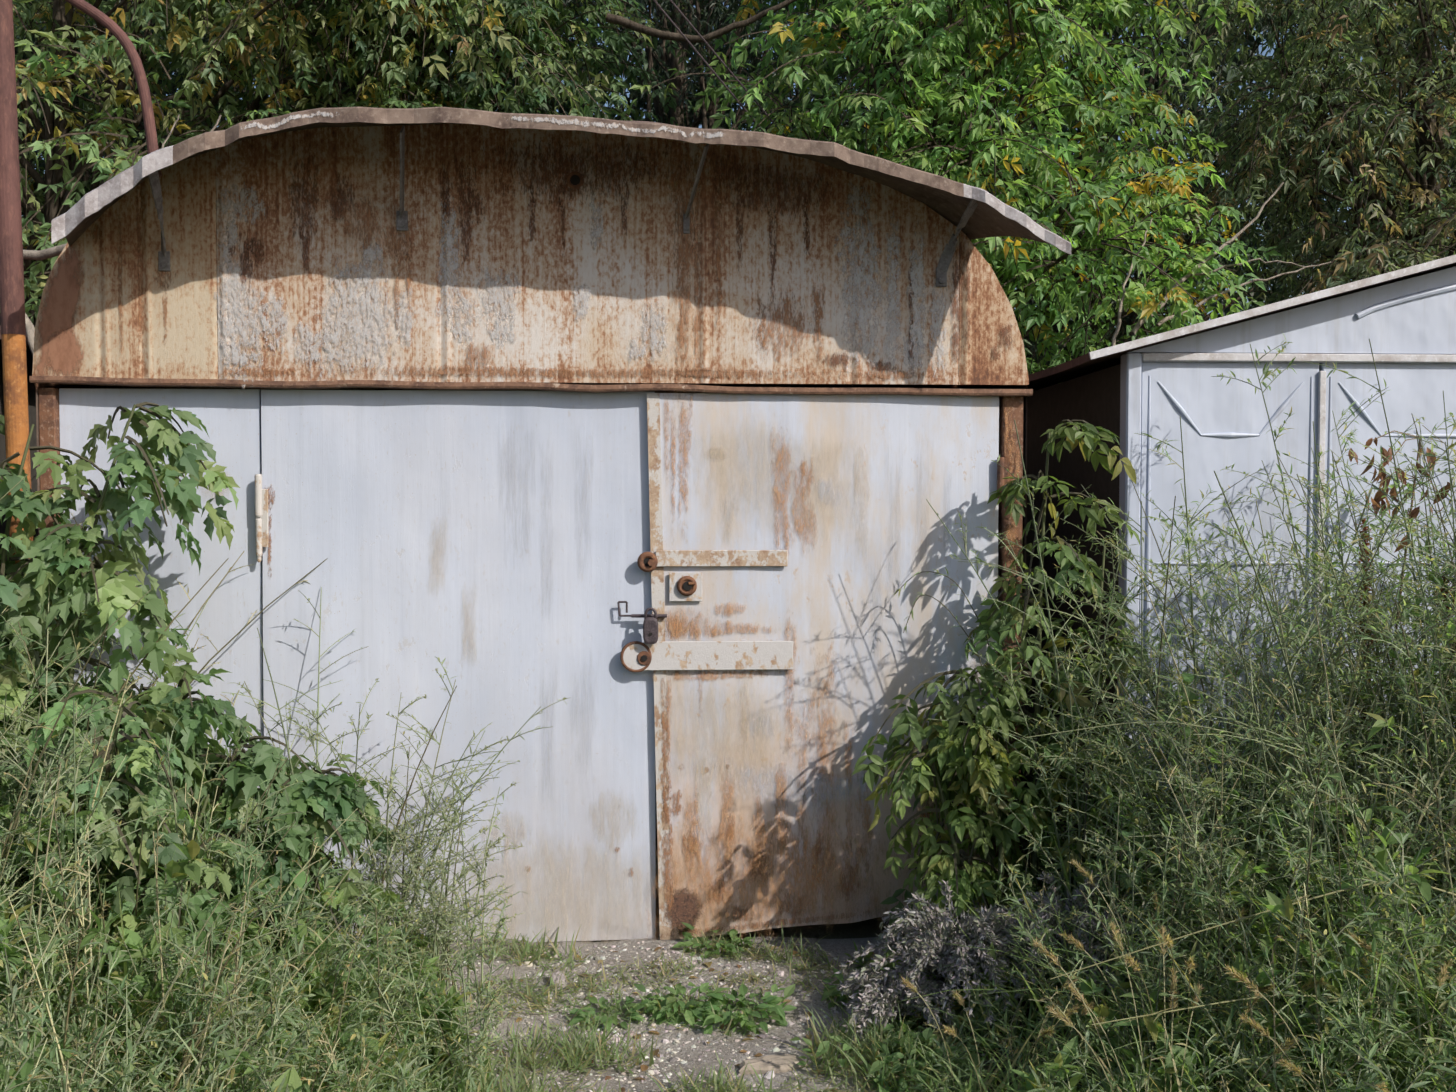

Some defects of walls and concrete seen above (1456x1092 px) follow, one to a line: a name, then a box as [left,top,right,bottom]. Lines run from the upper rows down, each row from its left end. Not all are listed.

corrosion [35,245,84,376]
corrosion [91,185,176,353]
corrosion [226,228,264,292]
corrosion [288,151,415,325]
corrosion [334,137,933,380]
corrosion [950,232,972,385]
corrosion [993,325,1015,358]
corrosion [665,406,690,507]
corrosion [774,448,813,546]
corrosion [1005,413,1019,587]
corrosion [667,604,796,687]
corrosion [661,657,881,937]